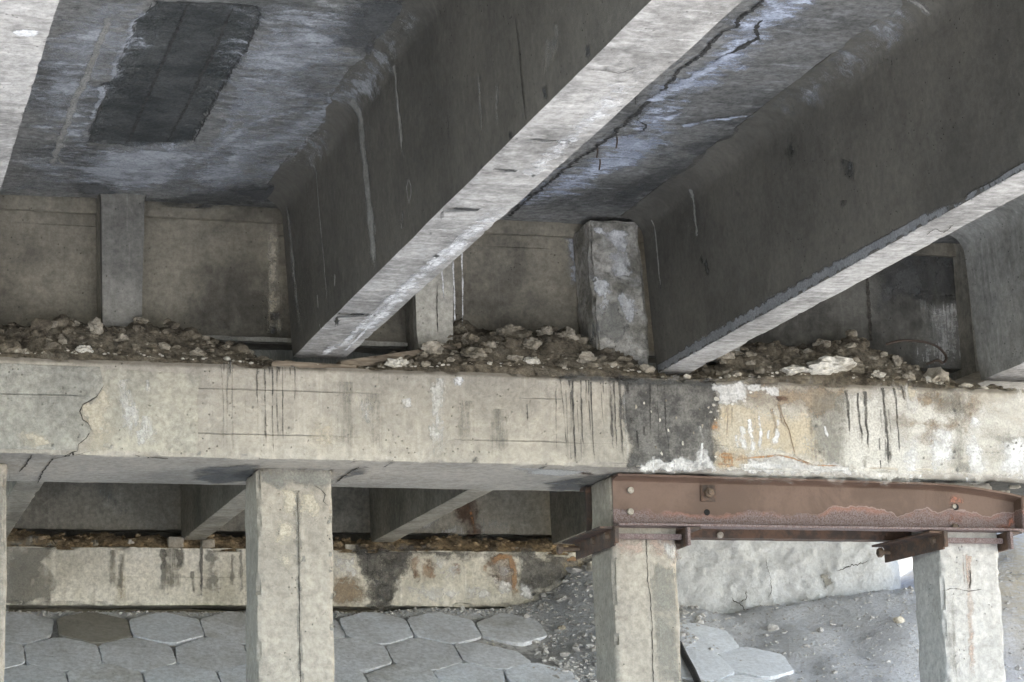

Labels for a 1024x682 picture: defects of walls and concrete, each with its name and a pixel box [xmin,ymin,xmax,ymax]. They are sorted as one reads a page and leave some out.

crack [508,0,764,216]
water stain [27,0,403,312]
water stain [256,365,296,448]
spalling [707,381,864,475]
water stain [556,374,1024,480]
crack [19,450,92,482]
water stain [110,550,123,587]
water stain [160,547,243,591]
water stain [333,544,471,612]
rust [484,553,518,592]
water stain [469,550,592,599]